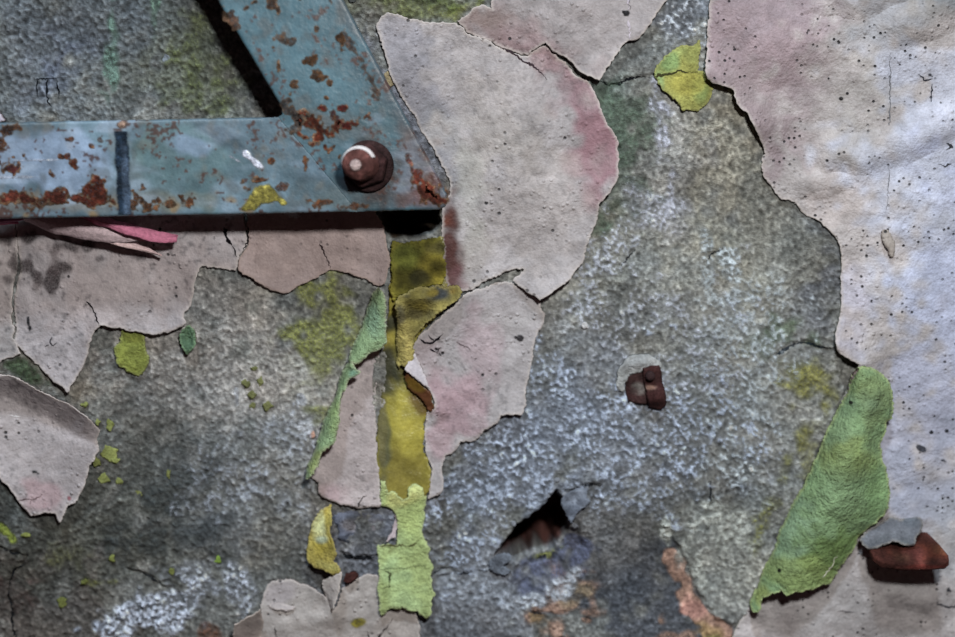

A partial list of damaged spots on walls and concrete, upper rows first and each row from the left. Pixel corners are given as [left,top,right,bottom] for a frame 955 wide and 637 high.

rust [223,0,281,31]
rust [280,54,371,171]
rust [0,123,25,176]
rust [58,137,78,170]
rust [0,170,116,211]
rust [130,184,196,213]
rust [405,154,449,207]
crack [223,227,249,257]
peeling [0,0,667,637]
peeling [658,0,955,637]
crack [0,546,28,637]
efflorescence [93,563,255,637]